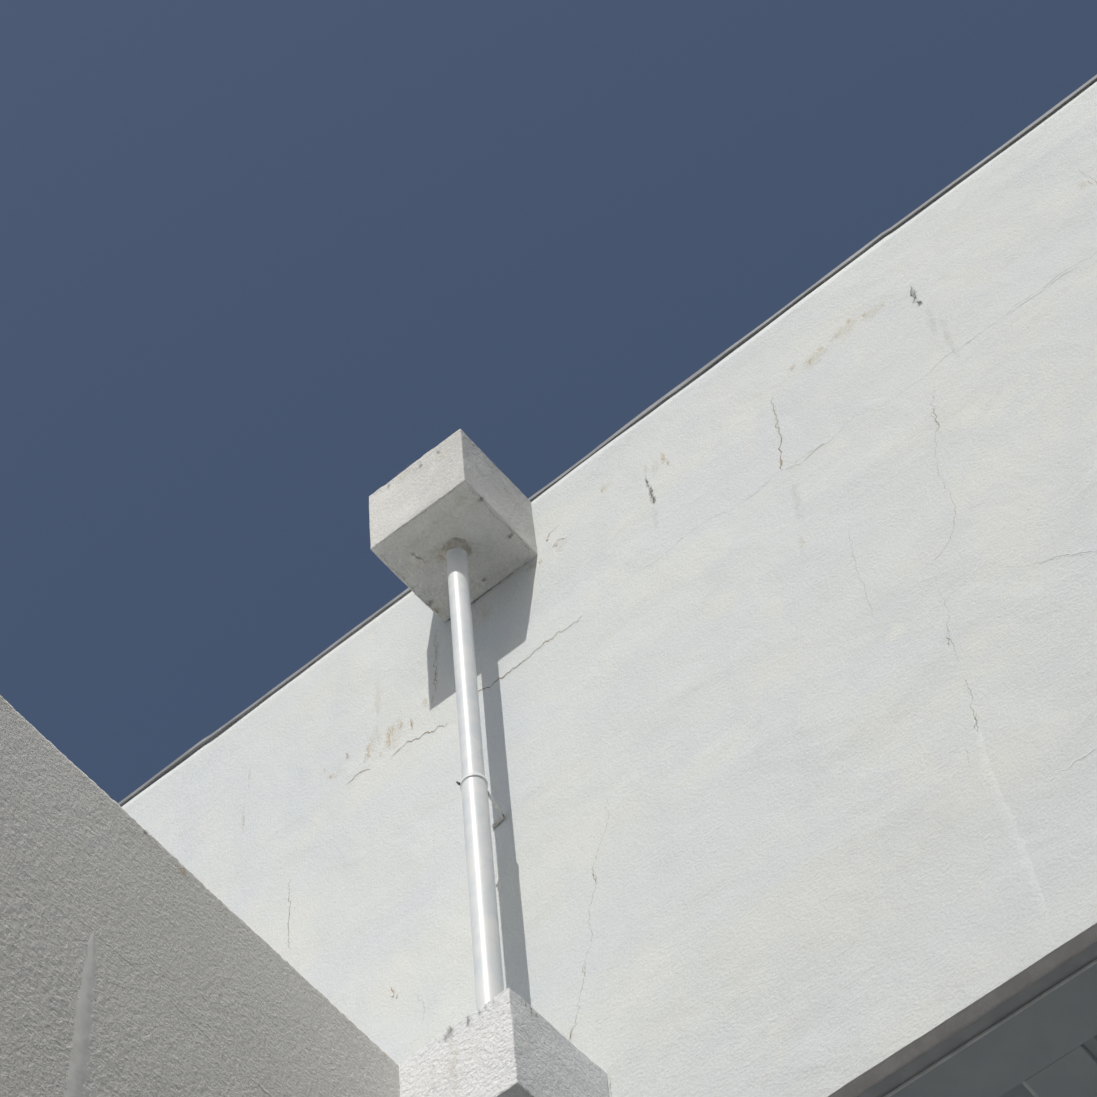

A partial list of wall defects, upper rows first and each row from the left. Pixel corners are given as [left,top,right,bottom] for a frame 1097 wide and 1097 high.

crack [738,398,824,507]
crack [478,620,579,692]